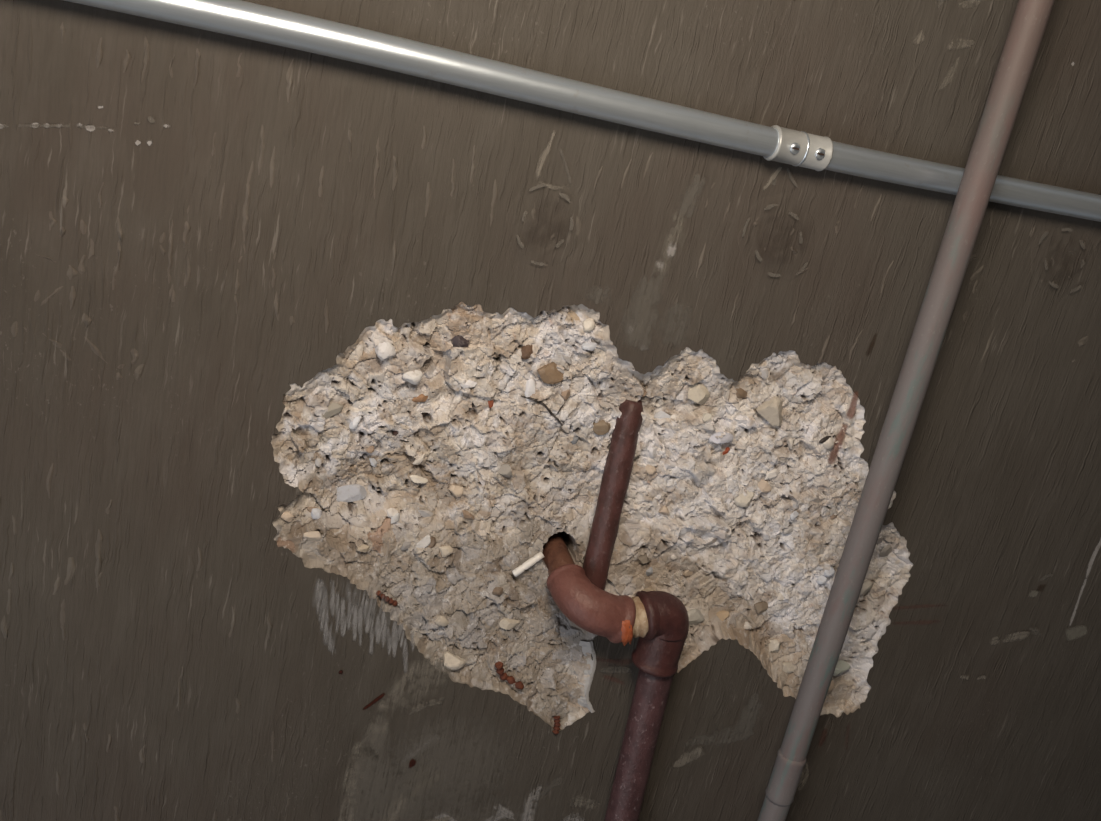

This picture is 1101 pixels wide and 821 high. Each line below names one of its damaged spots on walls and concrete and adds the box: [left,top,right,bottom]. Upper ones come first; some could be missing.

spalling [271,302,869,735]
spalling [820,522,913,717]